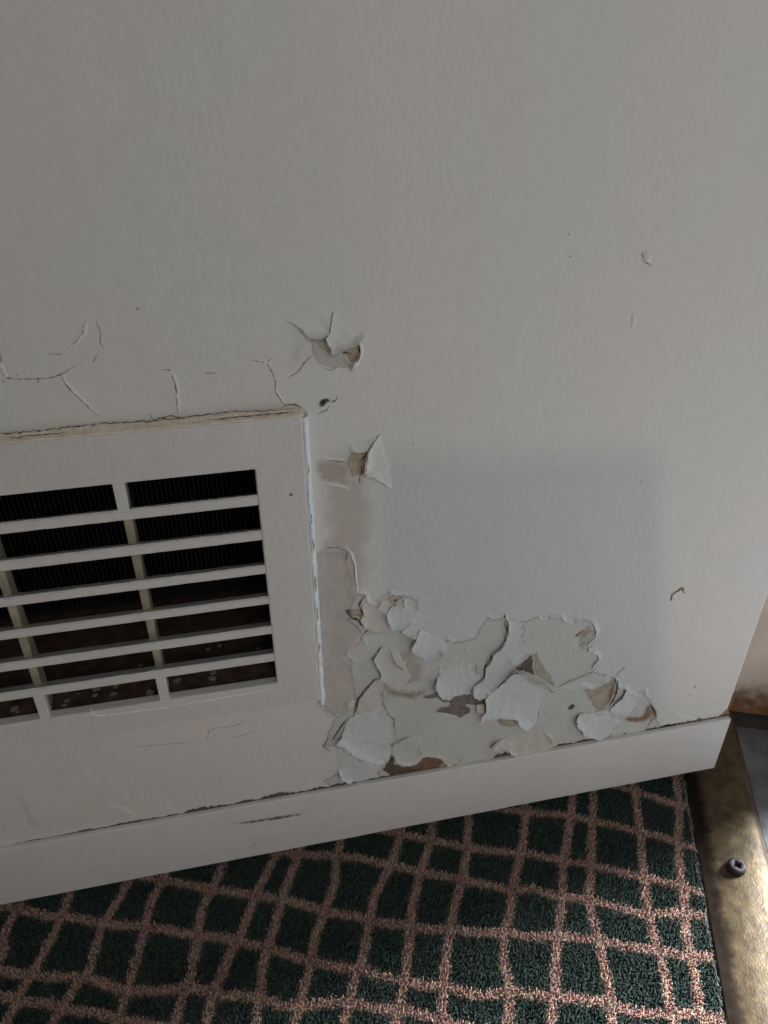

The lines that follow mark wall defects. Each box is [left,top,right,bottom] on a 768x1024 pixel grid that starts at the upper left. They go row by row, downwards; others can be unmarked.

crack [0,321,104,416]
crack [150,369,216,422]
crack [250,358,338,415]
peeling [285,311,364,378]
peeling [321,434,393,491]
peeling [316,545,661,786]